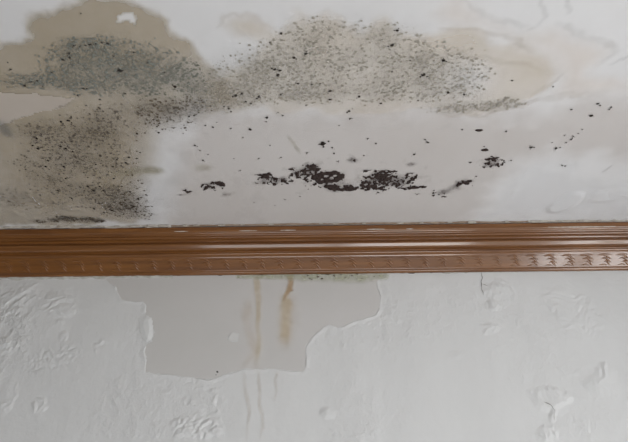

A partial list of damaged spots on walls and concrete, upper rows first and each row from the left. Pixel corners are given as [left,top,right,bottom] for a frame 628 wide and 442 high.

damp [0,0,527,223]
peeling [106,273,387,385]